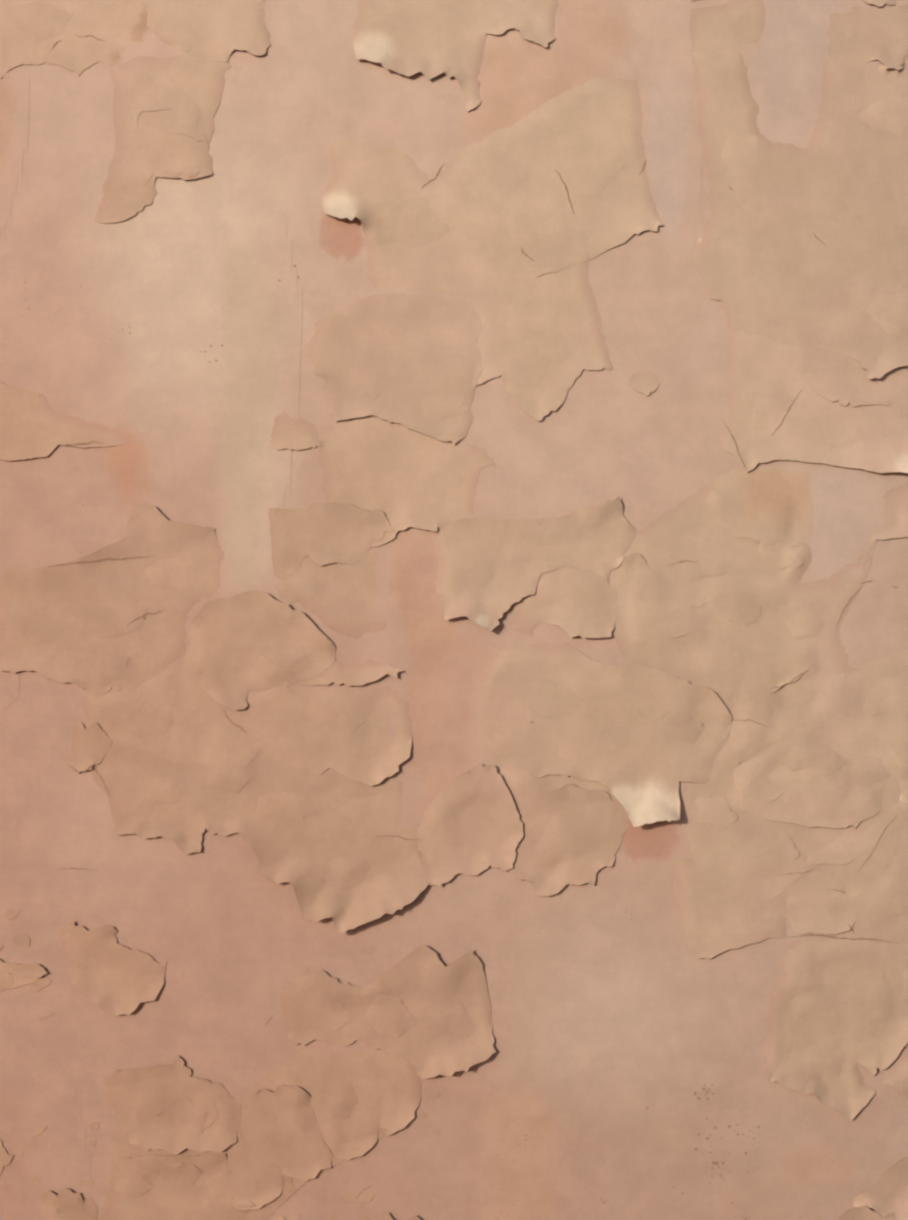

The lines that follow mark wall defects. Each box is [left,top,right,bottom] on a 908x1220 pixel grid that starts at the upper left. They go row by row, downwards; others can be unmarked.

peeling [0,0,271,223]
peeling [352,0,559,112]
peeling [269,50,908,1121]
peeling [0,503,431,934]
peeling [0,934,51,993]
peeling [78,945,496,1220]
peeling [838,1157,908,1220]